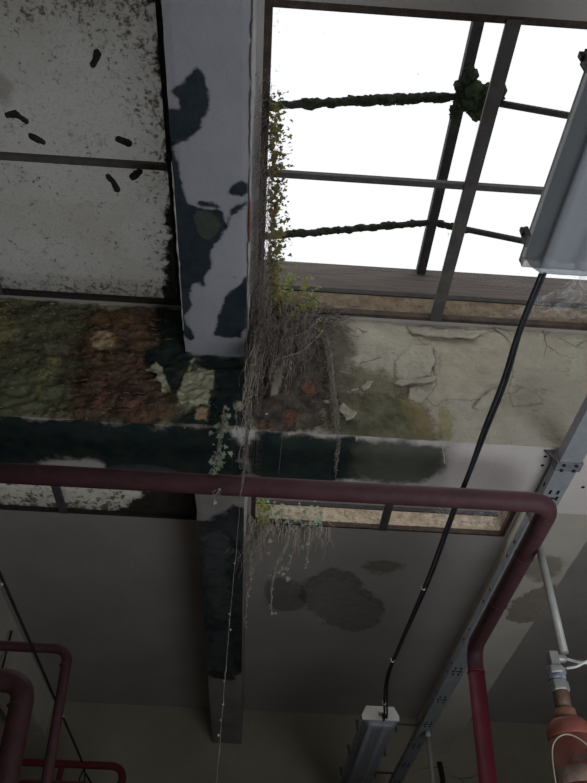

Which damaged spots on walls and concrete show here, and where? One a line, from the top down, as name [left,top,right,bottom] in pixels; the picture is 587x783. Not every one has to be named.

spalling [171,162,184,331]
damp [0,69,423,481]
spalling [247,0,255,329]
spalling [57,306,214,424]
peeling [338,403,357,420]
damp [263,569,385,633]